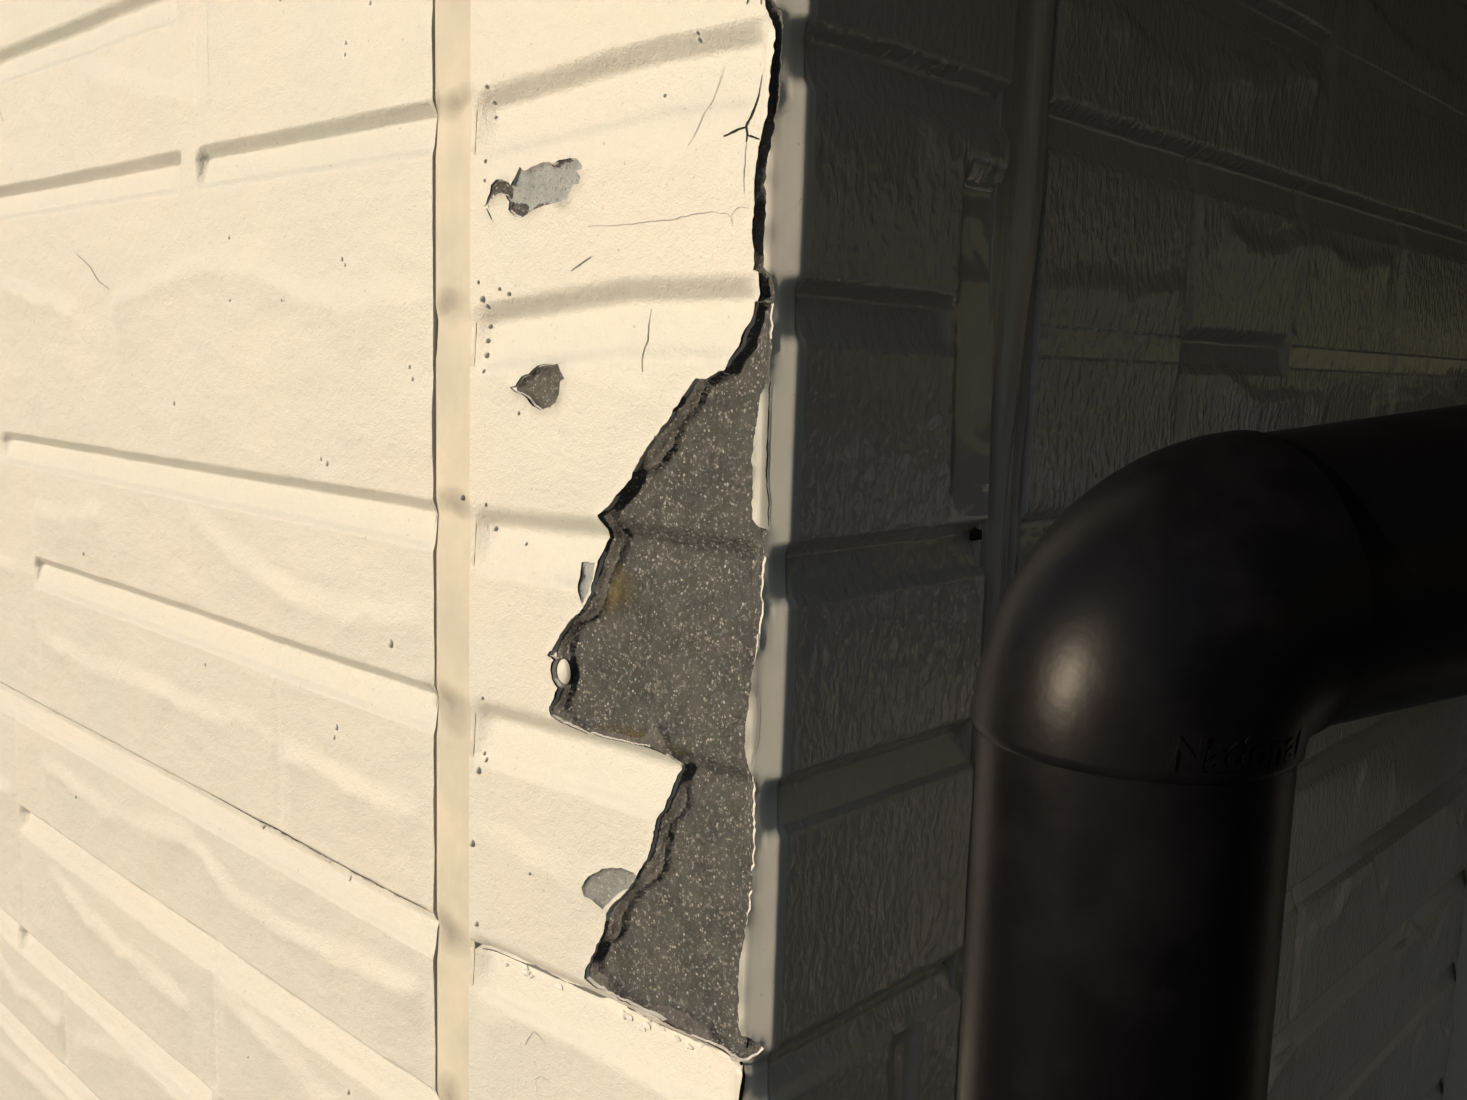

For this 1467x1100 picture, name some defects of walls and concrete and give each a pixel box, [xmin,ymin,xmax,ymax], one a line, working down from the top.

peeling [482,158,582,218]
crack [571,0,783,301]
peeling [511,364,564,410]
peeling [549,301,774,1061]
crack [483,948,746,1100]